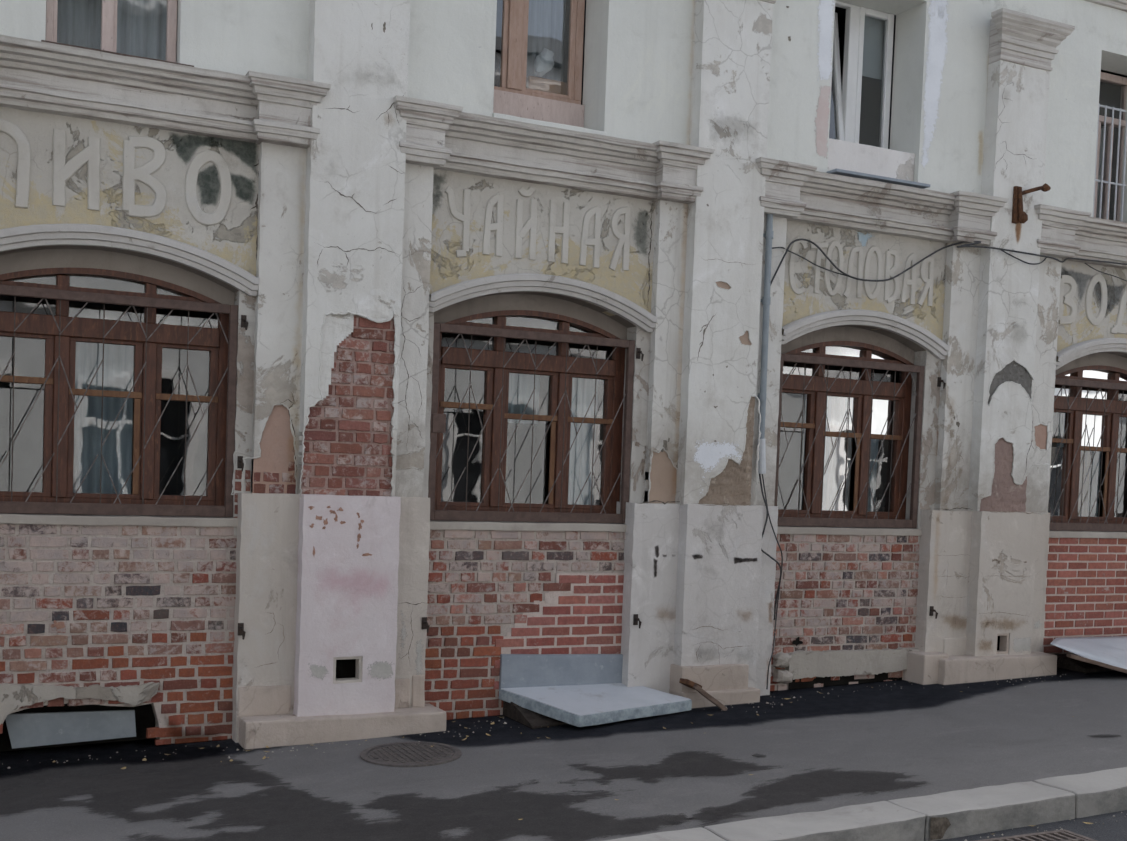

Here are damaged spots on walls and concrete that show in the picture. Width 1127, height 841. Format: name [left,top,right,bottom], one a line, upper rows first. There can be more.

crack [329,95,404,126]
crack [319,166,402,213]
crack [697,314,716,361]
flaking render [987,357,1035,406]
flaking render [231,311,398,556]
flaking render [635,438,678,503]
flaking render [696,394,761,505]
flaking render [979,422,1049,515]